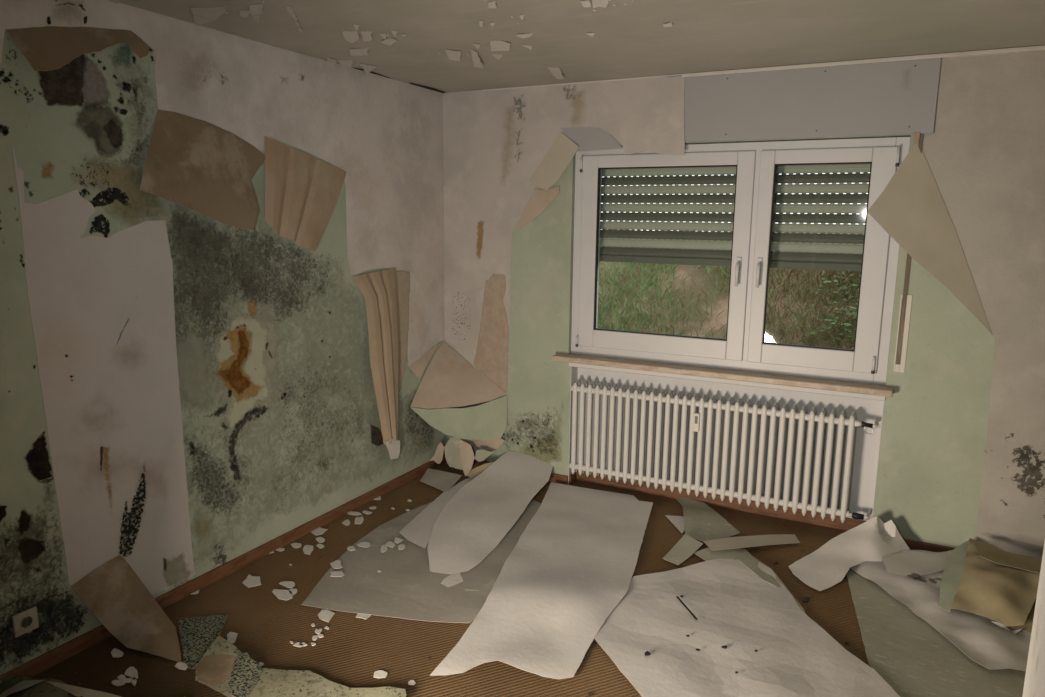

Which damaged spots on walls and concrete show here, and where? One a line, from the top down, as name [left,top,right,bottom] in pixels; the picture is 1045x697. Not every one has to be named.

peeling [580,0,634,11]
peeling [327,24,406,75]
peeling [439,14,533,68]
damp [0,40,161,238]
flaking render [561,127,623,152]
damp [169,212,328,347]
damp [25,431,53,493]
damp [189,397,268,512]
damp [371,425,384,446]
damp [1005,433,1045,499]
damp [119,467,146,557]
damp [0,505,87,667]